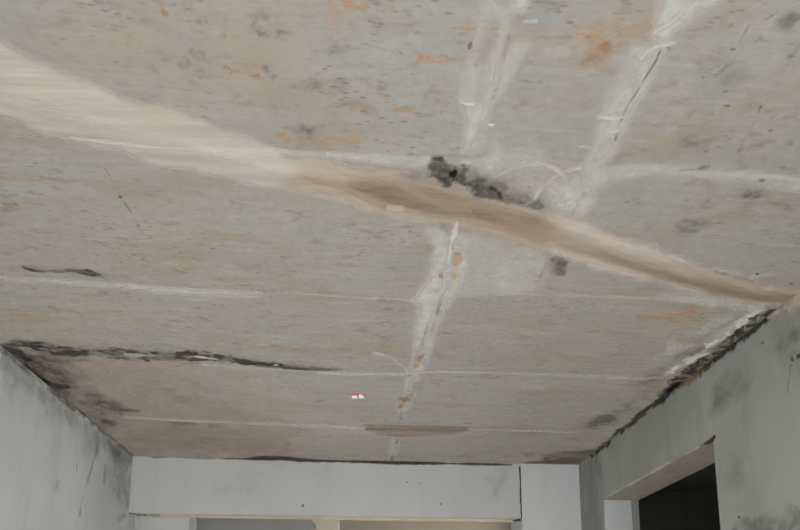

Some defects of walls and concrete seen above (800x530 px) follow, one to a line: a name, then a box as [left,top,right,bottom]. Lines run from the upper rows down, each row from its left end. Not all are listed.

crack [23,267,102,277]
damp [303,156,551,406]
damp [551,257,568,276]
damp [624,261,793,302]
damp [0,340,336,503]
damp [359,425,469,456]